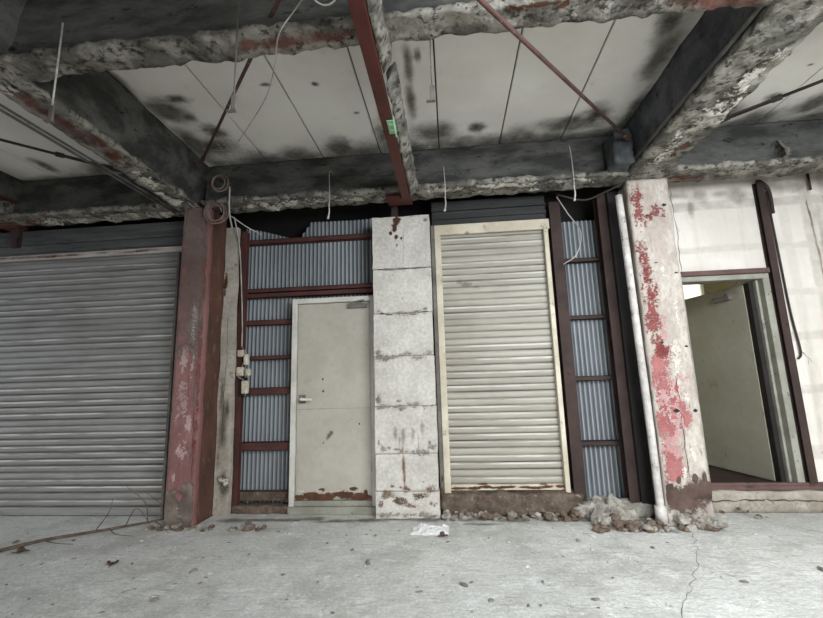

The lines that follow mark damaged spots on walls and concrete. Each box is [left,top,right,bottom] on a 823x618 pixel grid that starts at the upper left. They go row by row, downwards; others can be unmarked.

water stain [405,52,420,77]
water stain [646,12,682,76]
water stain [145,97,194,121]
water stain [220,130,389,166]
water stain [411,108,614,151]
spalling [639,44,794,176]
water stain [718,96,823,127]
peeling [36,168,209,485]
spalling [630,186,740,522]
corrosion [295,487,372,500]
corrosion [440,477,565,511]
crack [681,534,738,618]